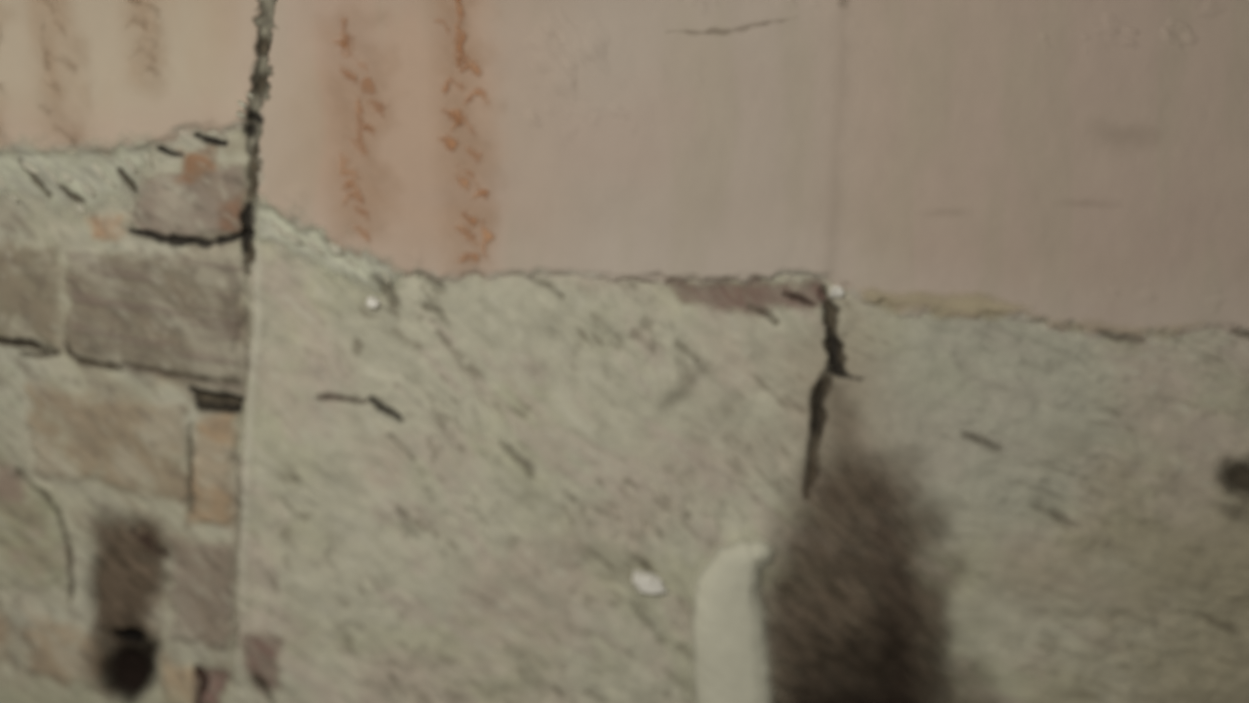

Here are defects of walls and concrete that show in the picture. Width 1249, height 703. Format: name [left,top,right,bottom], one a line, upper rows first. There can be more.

spalling [0,142,154,213]
crack [129,0,276,266]
spalling [255,200,399,309]
spalling [677,280,846,316]
crack [804,286,861,499]